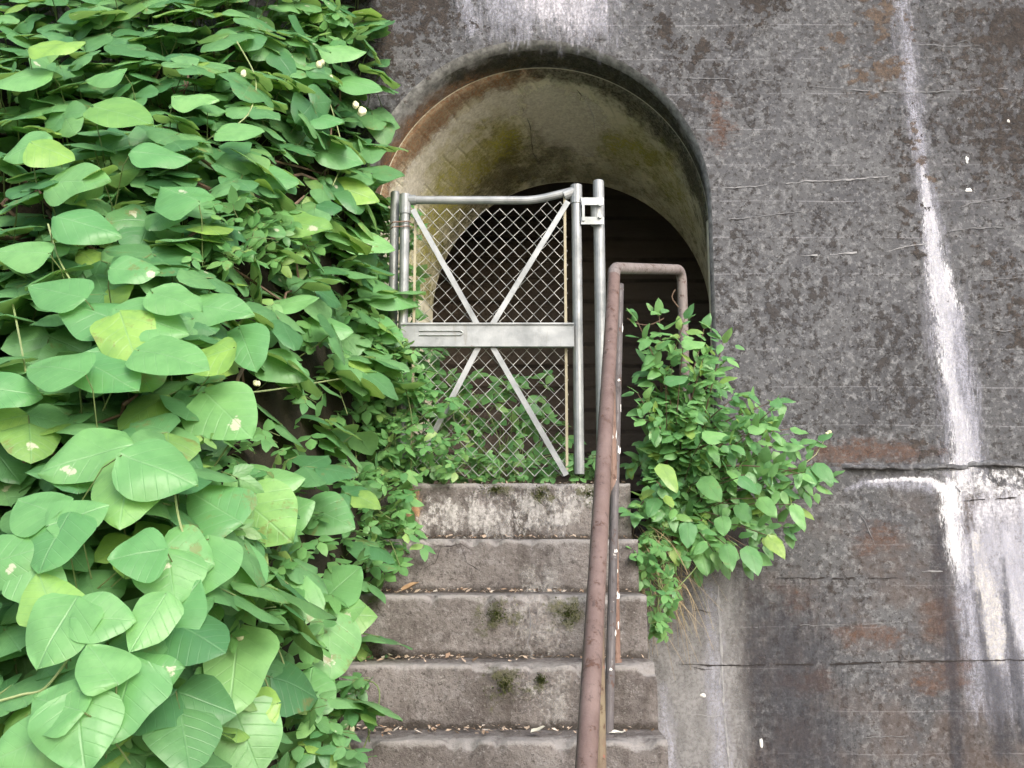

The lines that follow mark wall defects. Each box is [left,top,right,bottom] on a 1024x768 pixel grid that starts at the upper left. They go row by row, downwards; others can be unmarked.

leakage [416,127,524,307]
leakage [857,0,1024,768]
crack [681,586,1024,768]